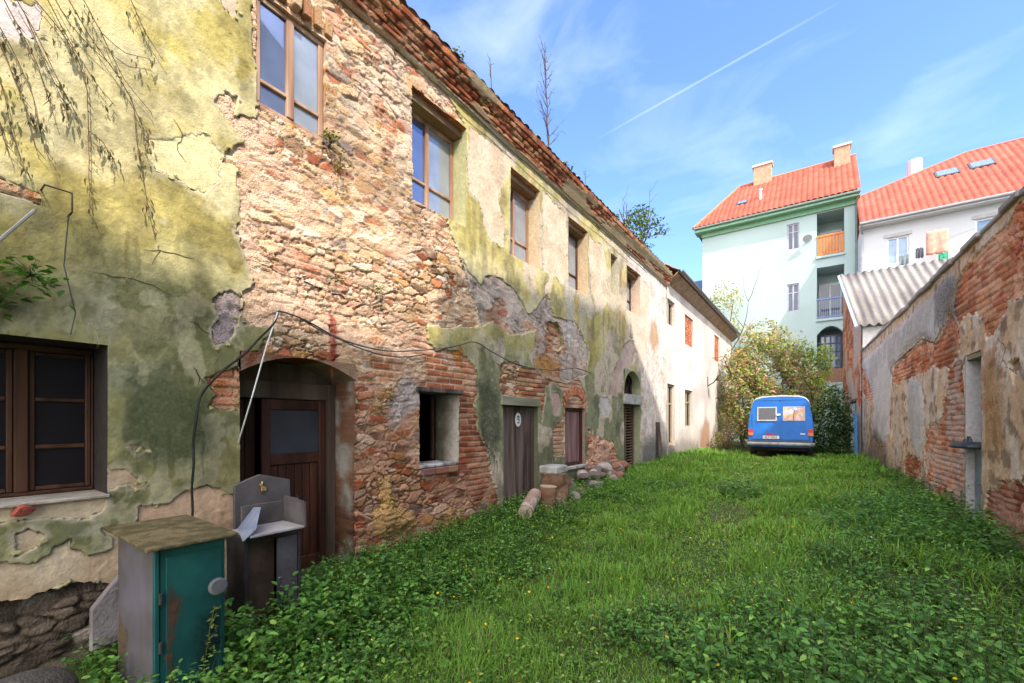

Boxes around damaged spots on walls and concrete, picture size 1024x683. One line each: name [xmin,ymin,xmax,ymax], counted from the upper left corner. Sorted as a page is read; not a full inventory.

crack [88,249,190,296]
spalling [146,0,651,562]
spalling [861,201,1024,507]
spalling [0,467,149,601]
spalling [985,477,1024,549]